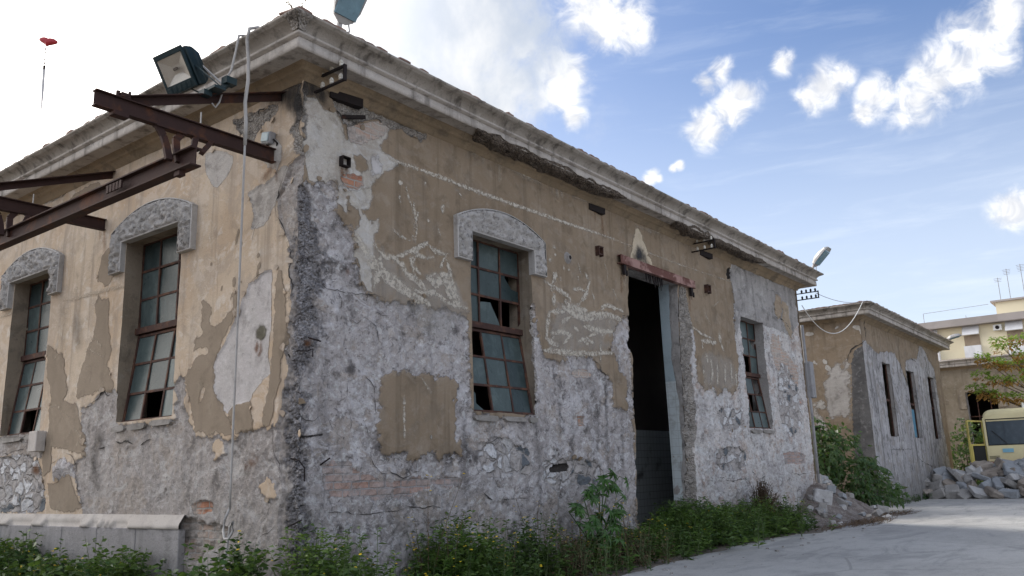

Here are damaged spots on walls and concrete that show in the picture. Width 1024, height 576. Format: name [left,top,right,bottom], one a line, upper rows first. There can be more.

flaking render [0,80,638,576]
flaking render [684,284,852,514]
flaking render [852,325,951,514]